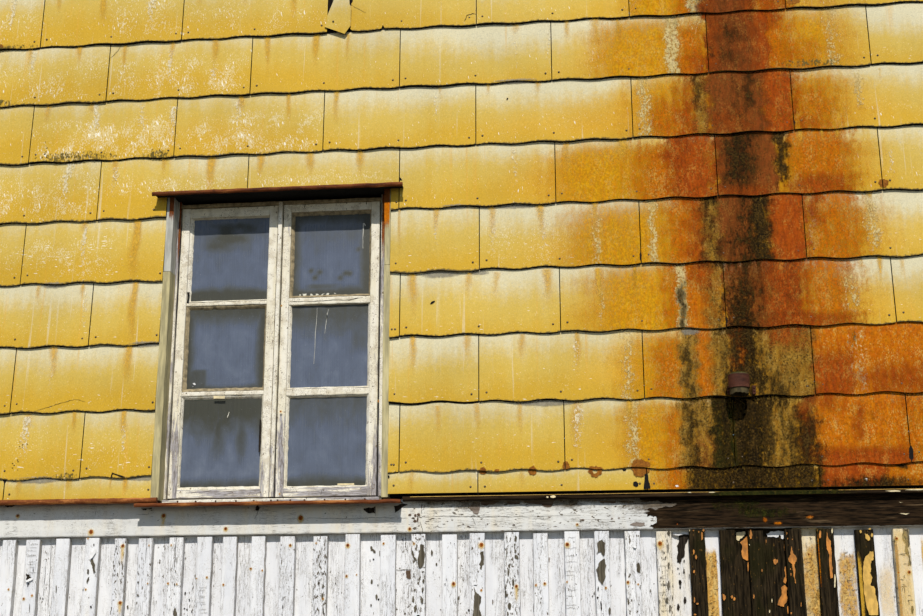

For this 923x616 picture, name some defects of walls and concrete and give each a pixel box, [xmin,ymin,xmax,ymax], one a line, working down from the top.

leakage [662,0,702,73]
leakage [636,77,652,135]
leakage [691,74,709,133]
leakage [647,200,659,262]
rust [557,0,923,489]
leakage [675,132,923,489]
leakage [620,330,641,467]
peeling [394,496,445,522]
peeling [469,494,563,515]
peeling [630,488,923,615]